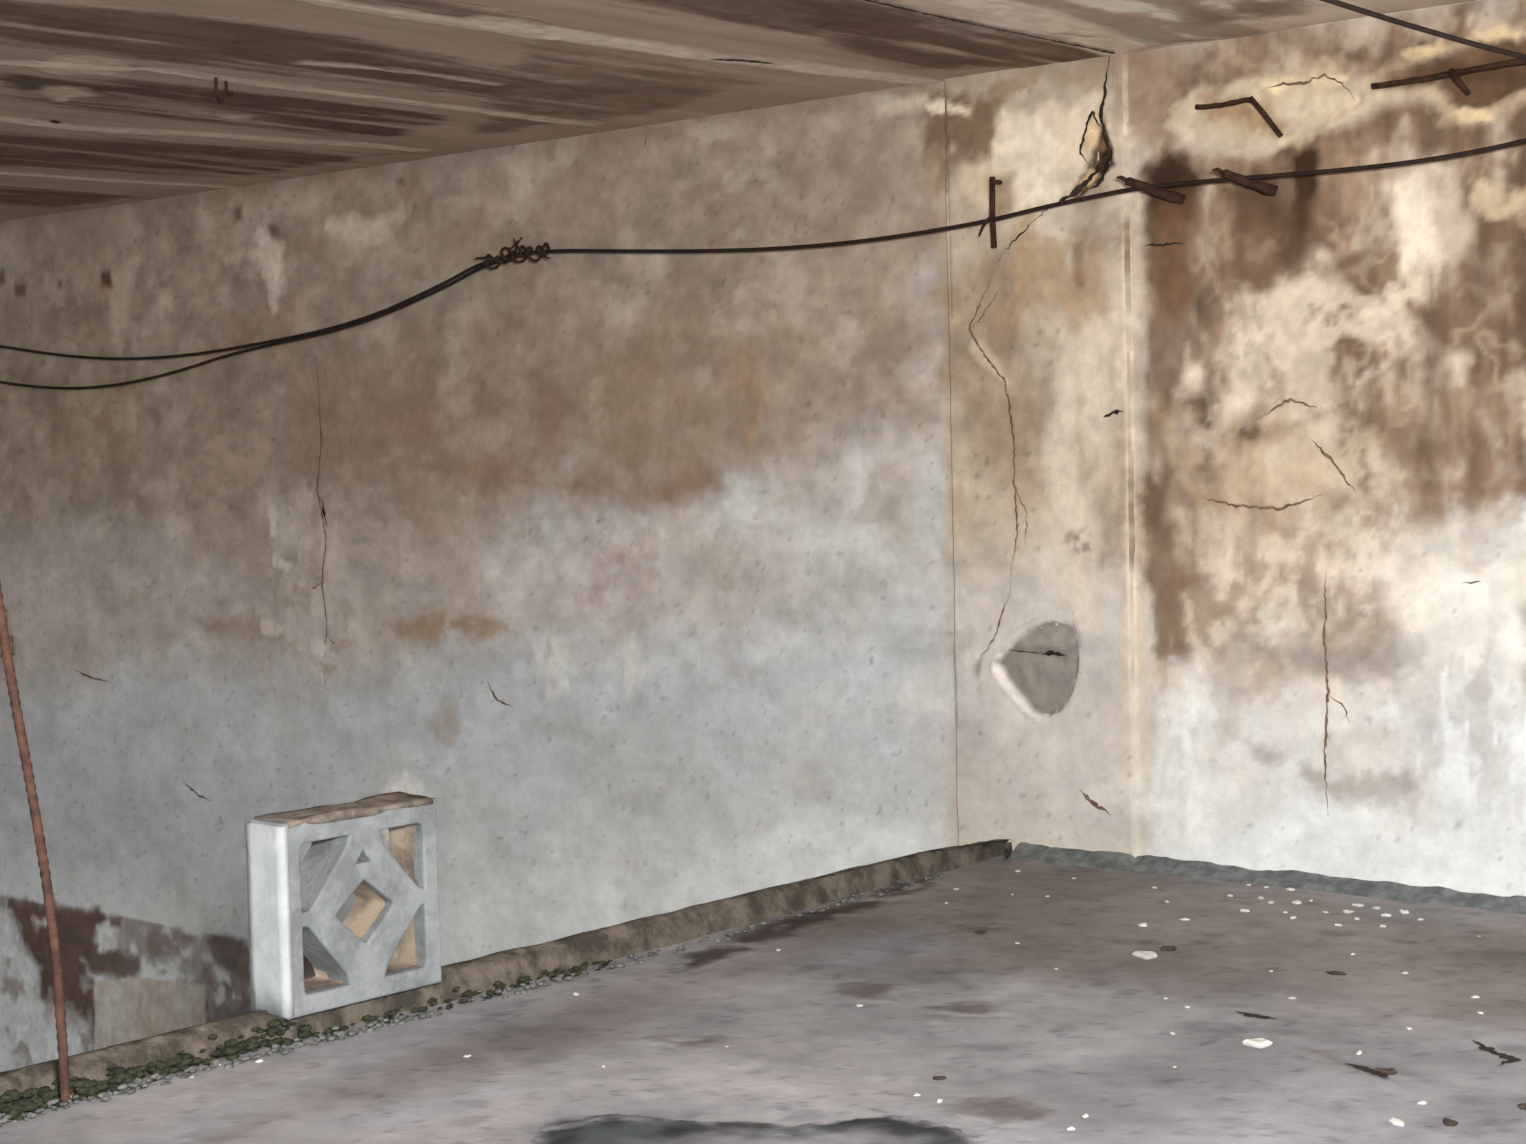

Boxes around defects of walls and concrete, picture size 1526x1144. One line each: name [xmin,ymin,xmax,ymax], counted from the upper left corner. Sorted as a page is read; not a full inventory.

crack [710,57,772,65]
flaking render [951,84,1119,219]
crack [312,373,335,702]
leakage [0,0,1526,860]
crack [865,0,1237,661]
crack [1322,571,1350,810]
peeling [0,888,254,1072]
peeling [303,954,316,979]